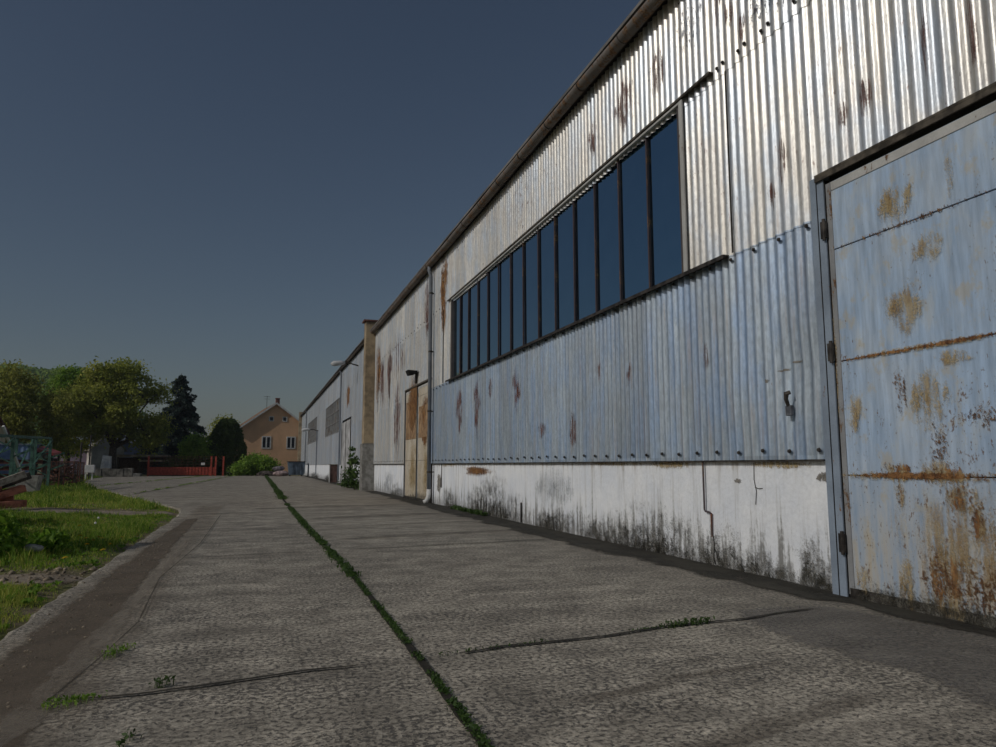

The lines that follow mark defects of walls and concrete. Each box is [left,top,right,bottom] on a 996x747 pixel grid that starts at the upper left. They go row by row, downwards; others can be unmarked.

rust [652,47,664,94]
rust [614,79,633,132]
rust [838,184,989,249]
rust [885,284,921,332]
rust [833,329,995,395]
rust [375,340,430,501]
rust [838,396,861,432]
leakage [469,481,519,521]
rust [844,372,996,621]
leakage [535,508,831,591]